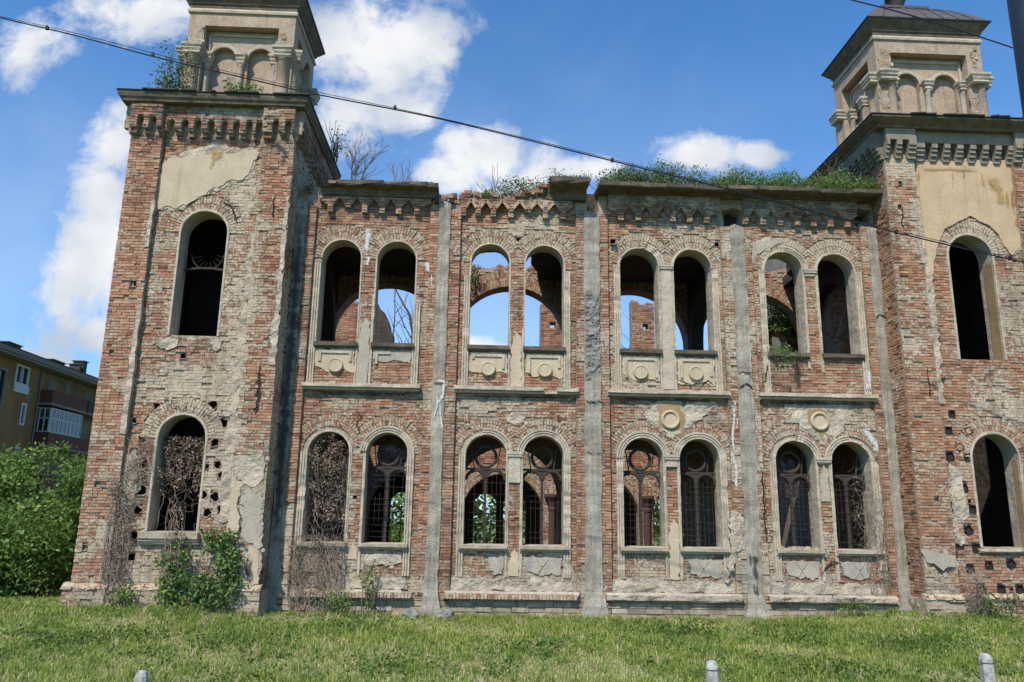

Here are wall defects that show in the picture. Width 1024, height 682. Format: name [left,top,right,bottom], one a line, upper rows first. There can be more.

water stain [168,137,249,168]
peeling [156,135,262,211]
water stain [917,167,1009,204]
crack [248,365,267,413]
water stain [612,398,709,411]
water stain [724,401,738,486]
peeling [119,394,270,586]
peeling [921,464,972,578]